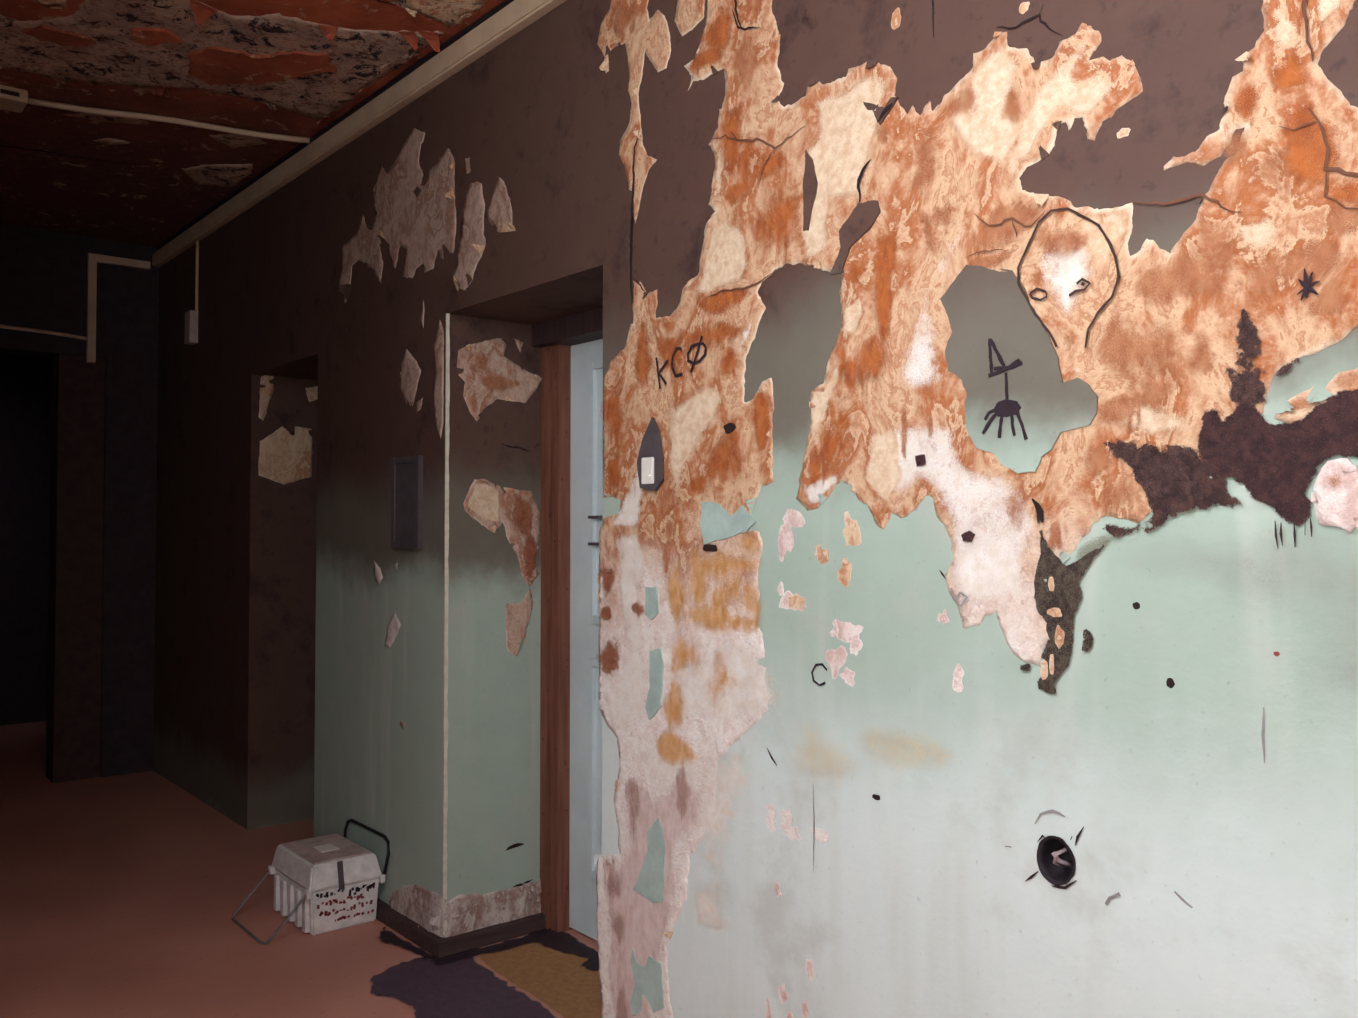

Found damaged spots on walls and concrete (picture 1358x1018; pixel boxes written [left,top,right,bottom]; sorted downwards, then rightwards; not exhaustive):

peeling [0,0,488,124]
crack [1301,0,1313,62]
peeling [338,128,515,303]
peeling [258,375,275,420]
peeling [306,386,318,402]
peeling [258,424,313,485]
peeling [593,0,1358,1018]
peeling [463,479,541,656]
flaking render [389,881,542,938]
water stain [370,956,557,1018]